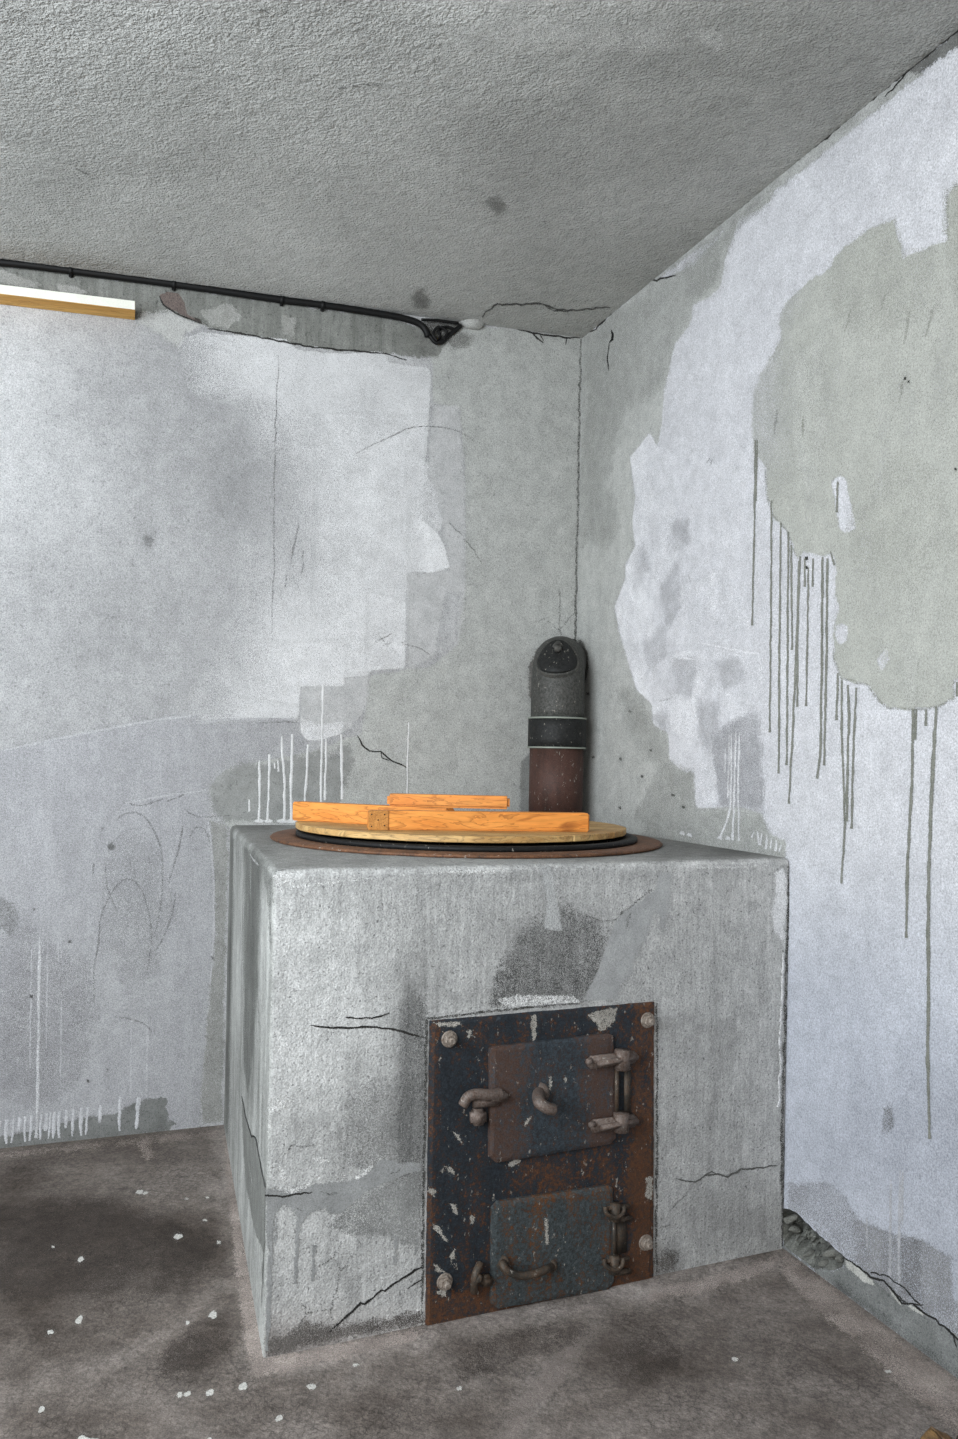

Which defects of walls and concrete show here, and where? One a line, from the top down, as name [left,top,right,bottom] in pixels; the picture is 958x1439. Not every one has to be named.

crack [808,30,958,153]
flaking render [0,190,787,858]
crack [483,302,620,638]
water stain [711,182,958,1139]
crack [242,1098,337,1211]
crack [298,1003,578,1332]
crack [654,866,790,1272]
spalling [783,1208,865,1274]
crack [844,1257,958,1347]